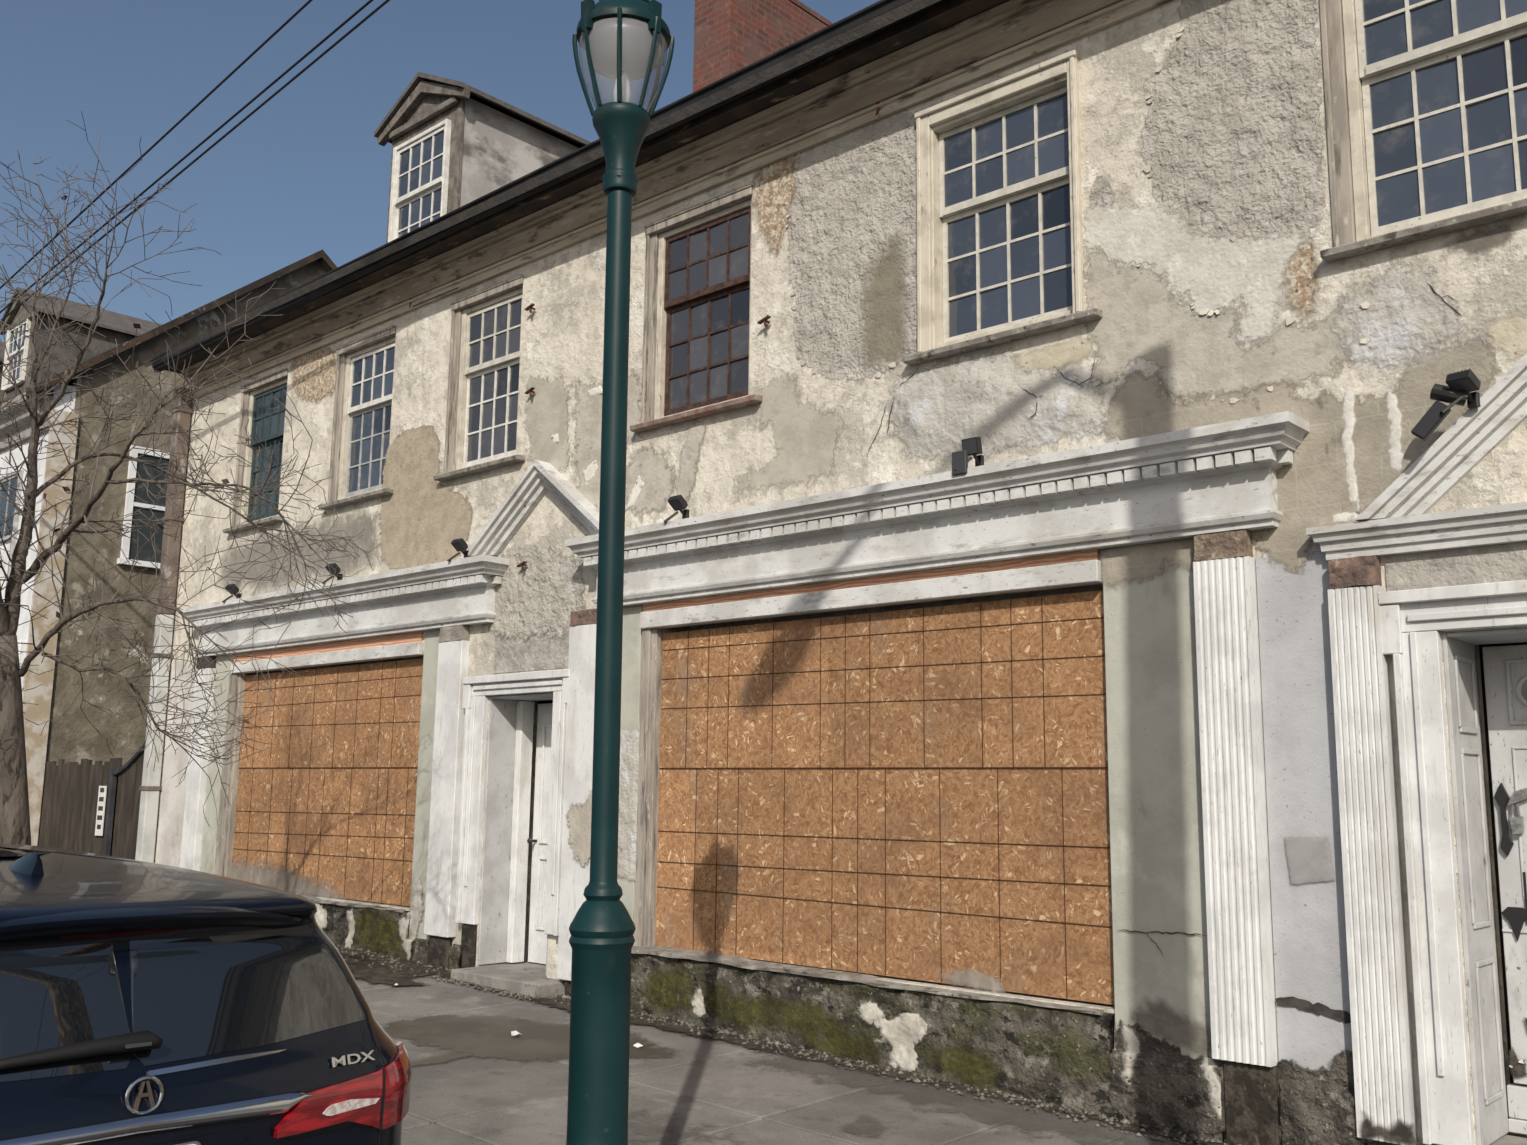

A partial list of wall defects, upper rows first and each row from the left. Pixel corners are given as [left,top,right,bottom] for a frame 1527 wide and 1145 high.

spalling [732,109,917,500]
flaking render [290,347,336,404]
spalling [354,425,472,569]
damp [1332,390,1361,522]
damp [1386,391,1404,472]
crack [1117,929,1207,957]
spalling [1107,1019,1225,1135]